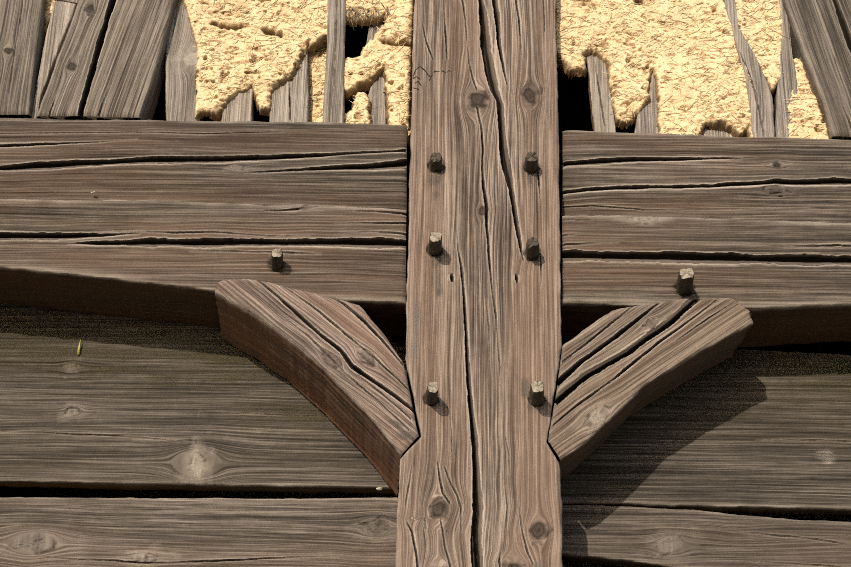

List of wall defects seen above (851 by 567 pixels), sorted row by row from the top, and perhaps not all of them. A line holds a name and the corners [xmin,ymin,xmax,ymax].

crack [0,0,407,173]
spalling [195,33,327,121]
spalling [344,61,392,125]
spalling [697,118,753,138]
spalling [759,62,780,95]
crack [376,0,851,567]
crack [258,281,414,430]
crack [0,431,203,442]